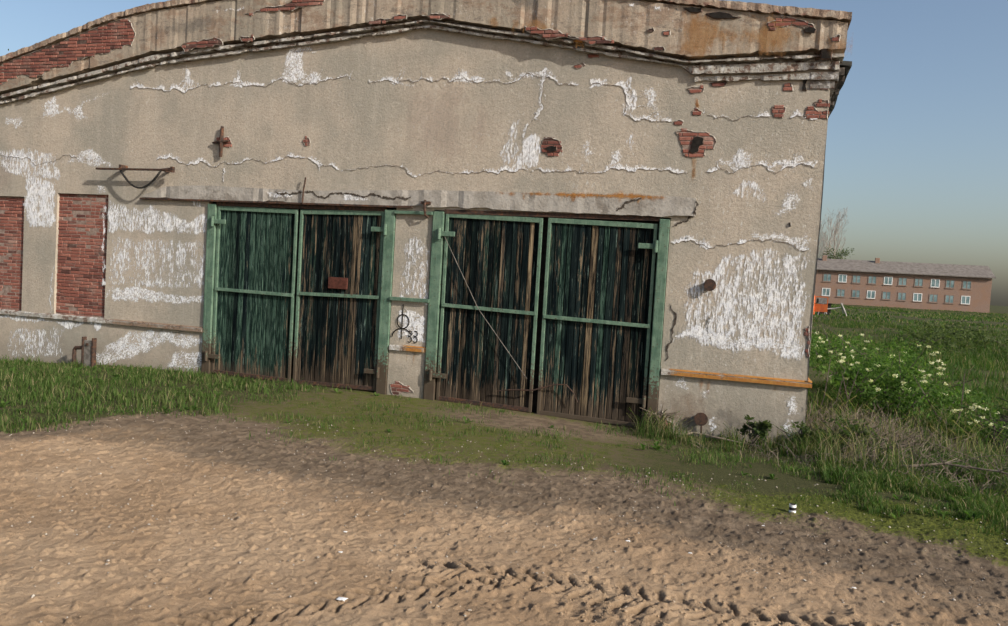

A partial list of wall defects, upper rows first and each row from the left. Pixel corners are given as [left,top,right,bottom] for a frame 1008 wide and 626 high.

flaking render [230,0,325,17]
flaking render [0,18,136,85]
crack [130,67,672,138]
peeling [500,122,563,168]
flaking render [674,108,717,159]
crack [703,108,818,121]
crack [157,151,816,200]
crack [617,197,641,211]
crack [669,200,811,252]
flaking render [0,148,207,358]
peeling [676,178,813,359]
peeling [96,329,202,368]